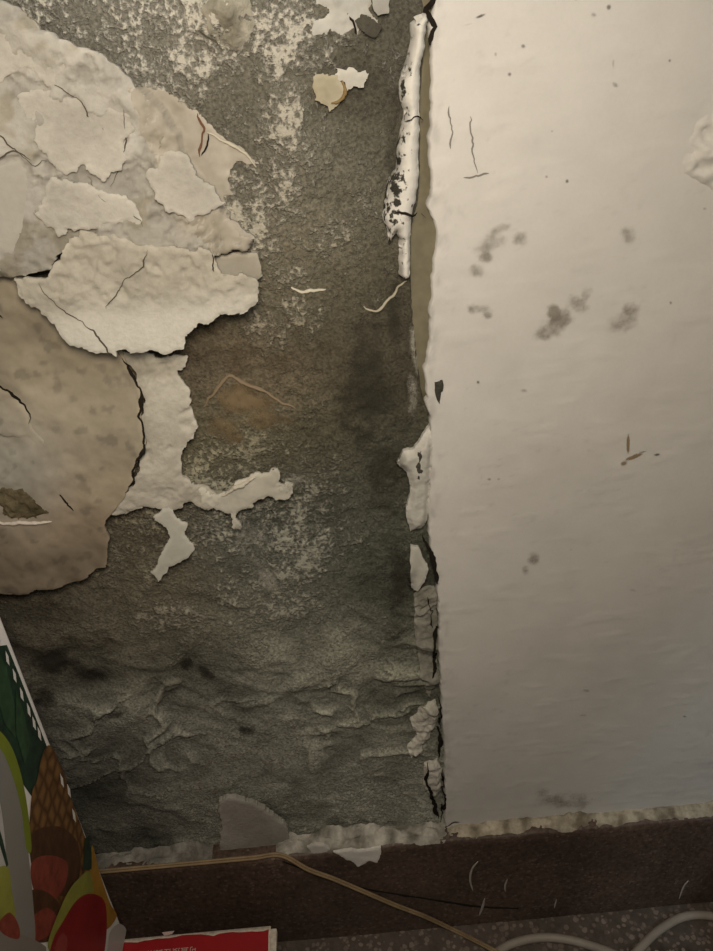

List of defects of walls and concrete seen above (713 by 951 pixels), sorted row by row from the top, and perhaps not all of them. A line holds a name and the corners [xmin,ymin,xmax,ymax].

peeling [372,0,389,16]
peeling [312,67,369,112]
crack [397,0,489,399]
flaking render [0,0,293,582]
spalling [435,380,444,404]
spalling [397,424,459,828]
peeling [307,842,381,867]